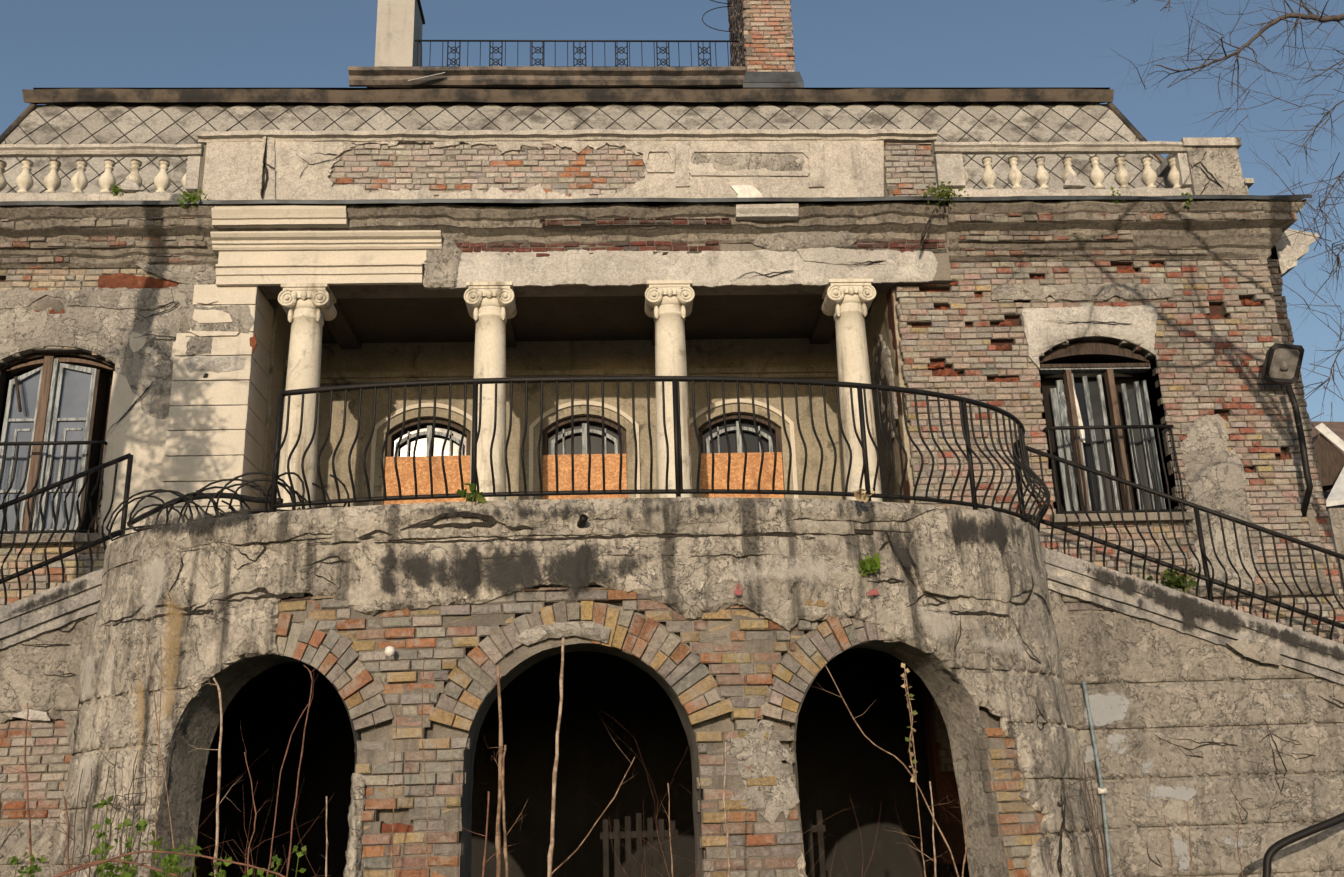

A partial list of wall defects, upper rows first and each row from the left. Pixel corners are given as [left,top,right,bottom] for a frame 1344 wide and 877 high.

crack [260,136,341,198]
spalling [329,144,645,199]
spalling [730,185,763,198]
spalling [98,256,187,289]
spalling [33,297,65,314]
flaking render [123,297,257,395]
leakage [420,505,501,518]
leakage [518,506,598,518]
leakage [881,524,912,569]
leakage [379,543,662,598]
leakage [733,557,827,595]
spalling [0,709,71,828]